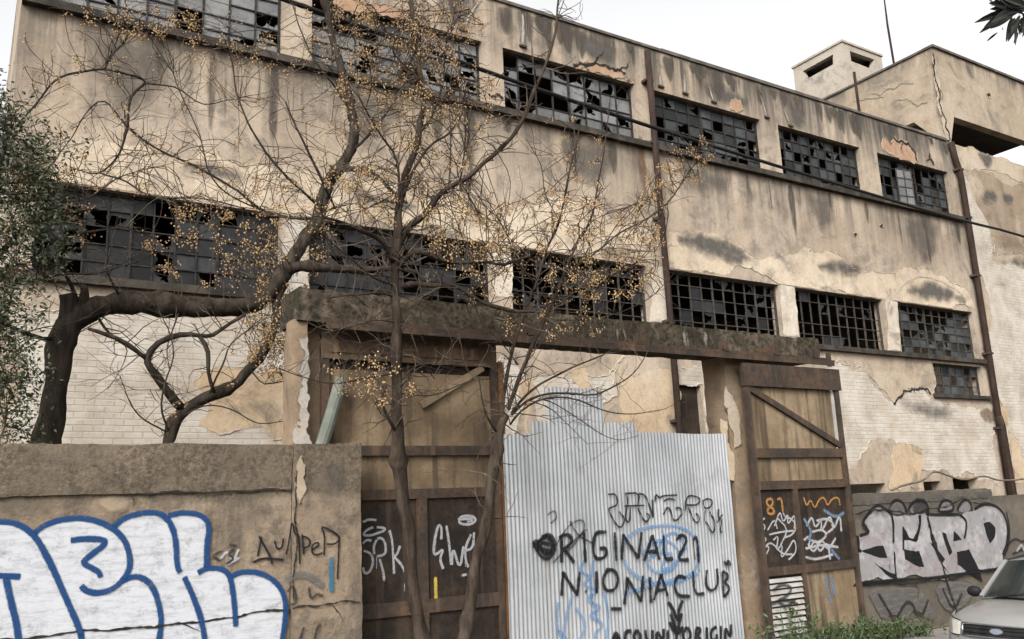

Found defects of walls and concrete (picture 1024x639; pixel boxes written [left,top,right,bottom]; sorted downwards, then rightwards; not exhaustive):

water stain [104,40,163,105]
water stain [269,66,279,134]
crack [853,53,951,165]
flaking render [6,308,59,443]
flaking render [62,303,312,504]
peeling [41,137,975,351]
peeling [497,356,742,481]
water stain [679,235,746,263]
water stain [820,263,859,275]
crack [894,387,931,405]
flaking render [822,146,1024,490]
crack [0,471,359,639]